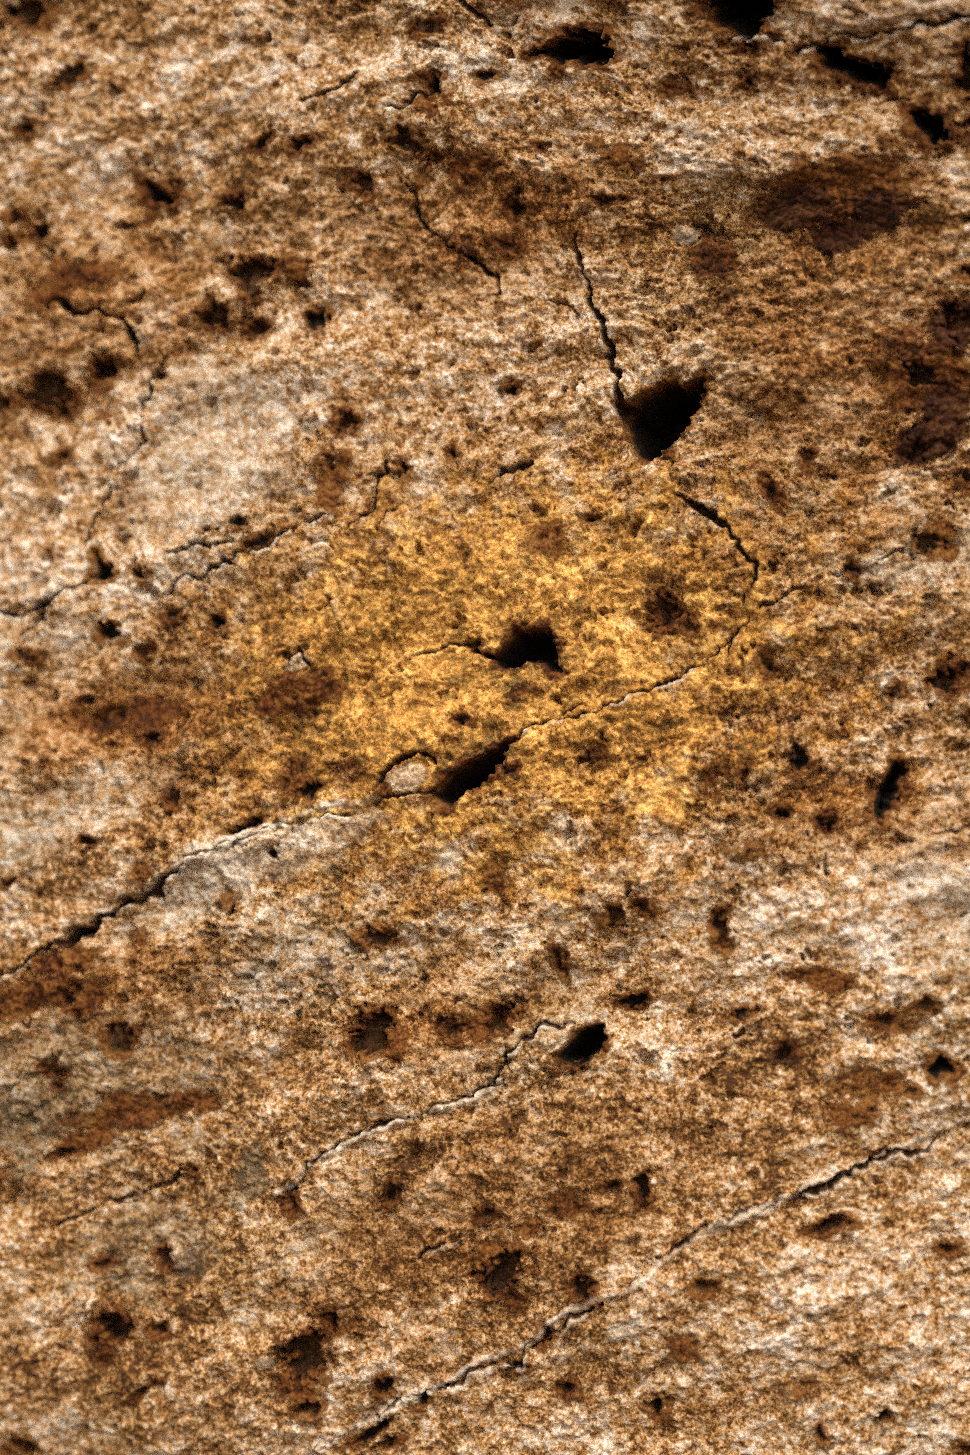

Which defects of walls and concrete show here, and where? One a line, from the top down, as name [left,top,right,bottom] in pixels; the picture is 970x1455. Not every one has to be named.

crack [548,206,643,427]
crack [2,752,440,978]
crack [305,1021,569,1173]
crack [656,1130,962,1259]
crack [563,1310,586,1331]
crack [317,1356,526,1448]